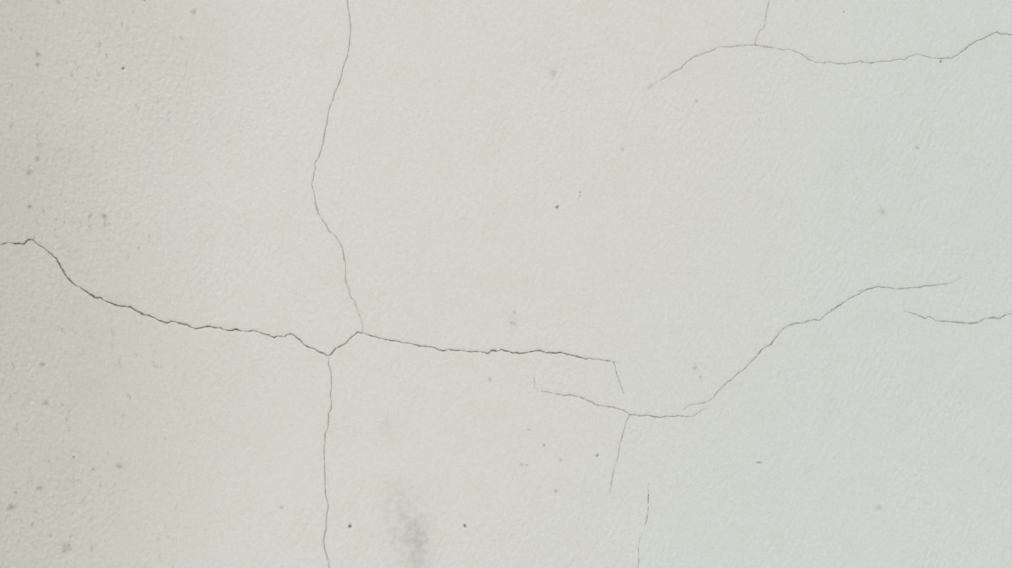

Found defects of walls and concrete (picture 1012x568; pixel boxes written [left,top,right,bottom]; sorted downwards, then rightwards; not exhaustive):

crack [14,239,250,332]